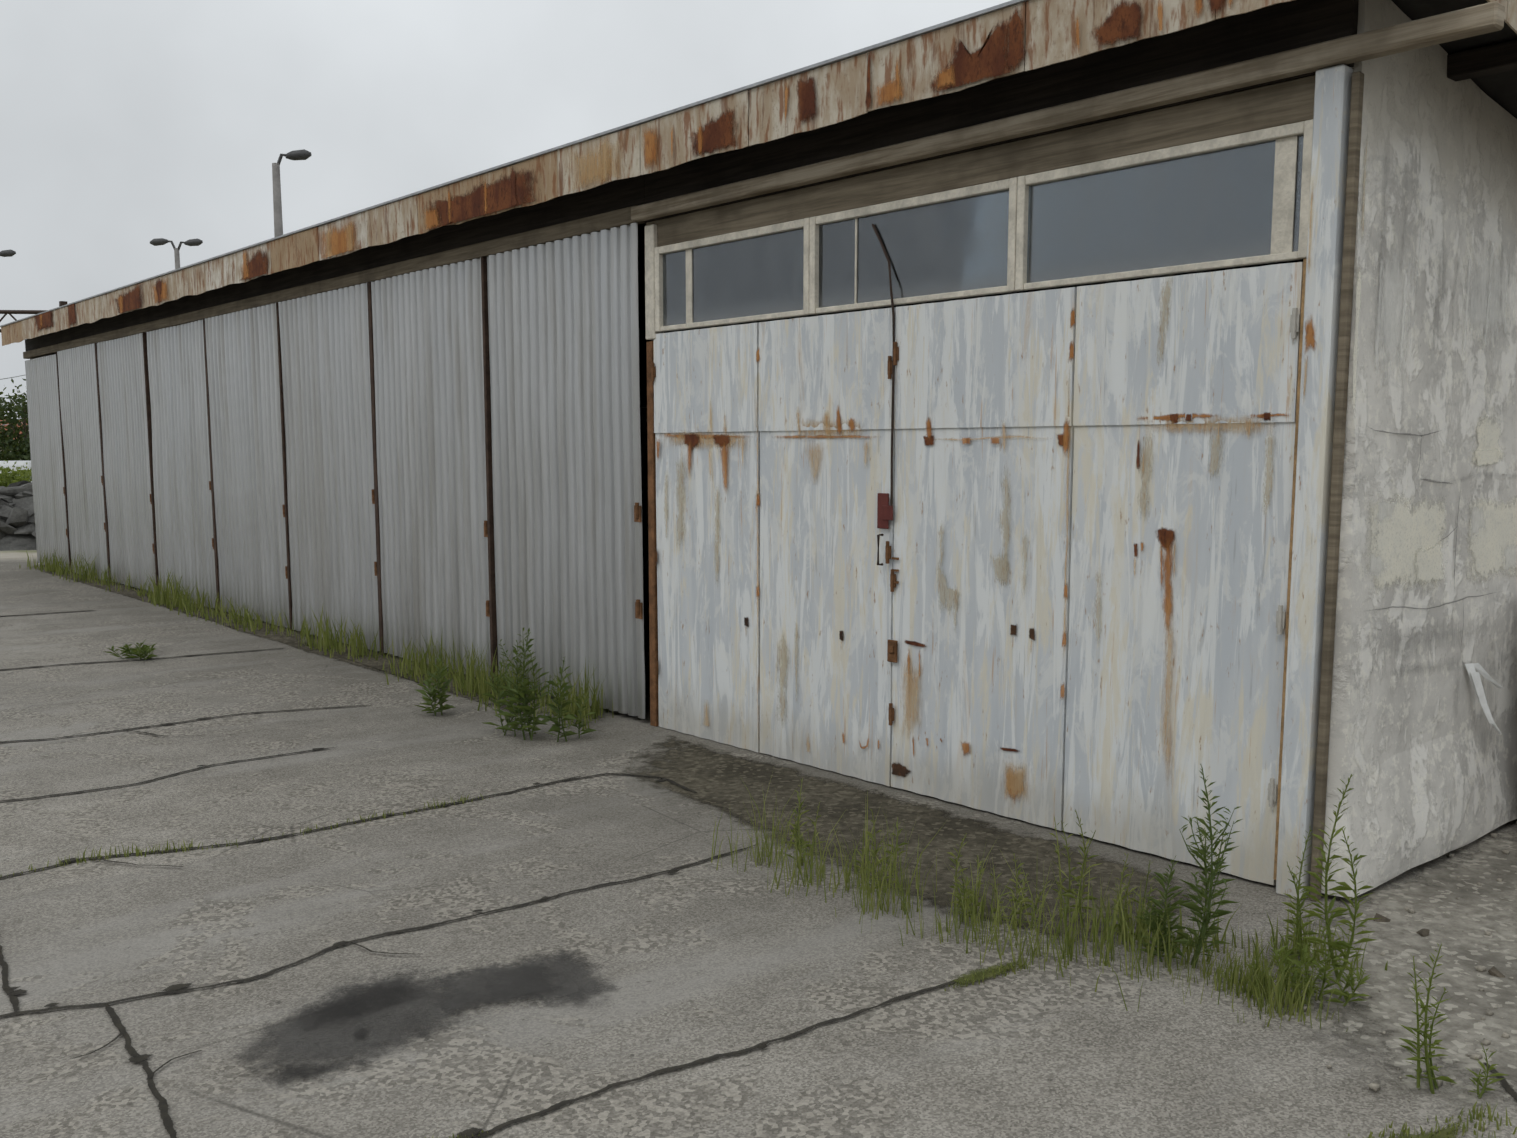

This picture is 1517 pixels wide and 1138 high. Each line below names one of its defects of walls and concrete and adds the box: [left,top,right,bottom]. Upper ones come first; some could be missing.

corrosion [930,8,1026,91]
corrosion [1076,0,1163,52]
corrosion [785,76,816,122]
corrosion [691,110,736,155]
corrosion [425,167,537,229]
crack [0,648,282,670]
corrosion [1134,528,1175,762]
crack [0,705,365,743]
crack [0,747,334,802]
crack [0,773,697,878]
crack [0,845,755,1138]
crack [456,980,955,1138]